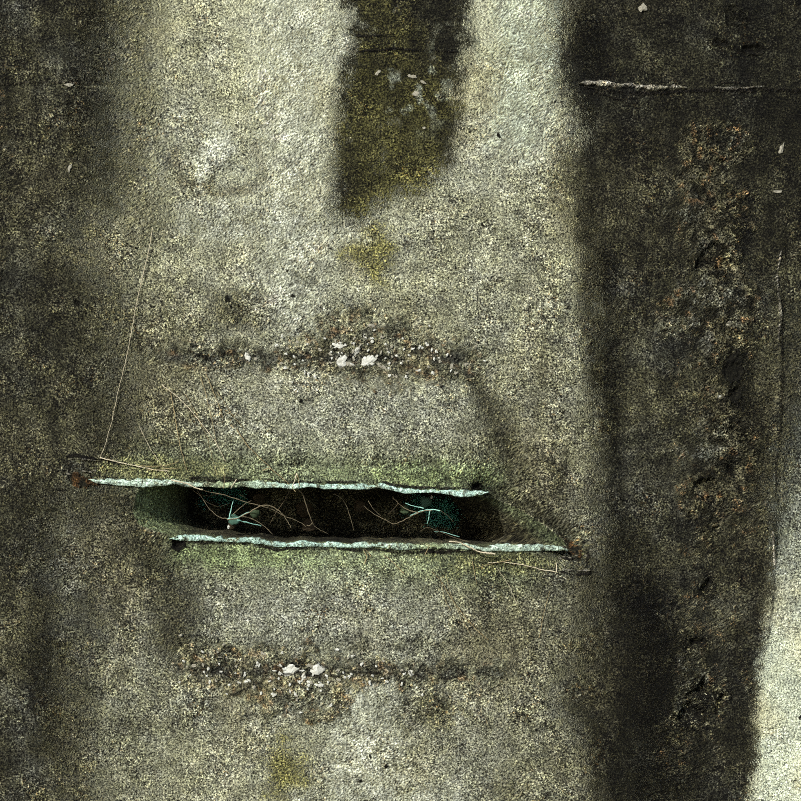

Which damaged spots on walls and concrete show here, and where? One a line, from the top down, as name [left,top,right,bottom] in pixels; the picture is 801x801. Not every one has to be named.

water stain [0,0,369,801]
water stain [477,0,801,801]
water stain [465,364,529,481]
crack [189,476,358,484]
crack [382,481,485,490]
crack [186,541,478,555]
crack [559,550,592,576]